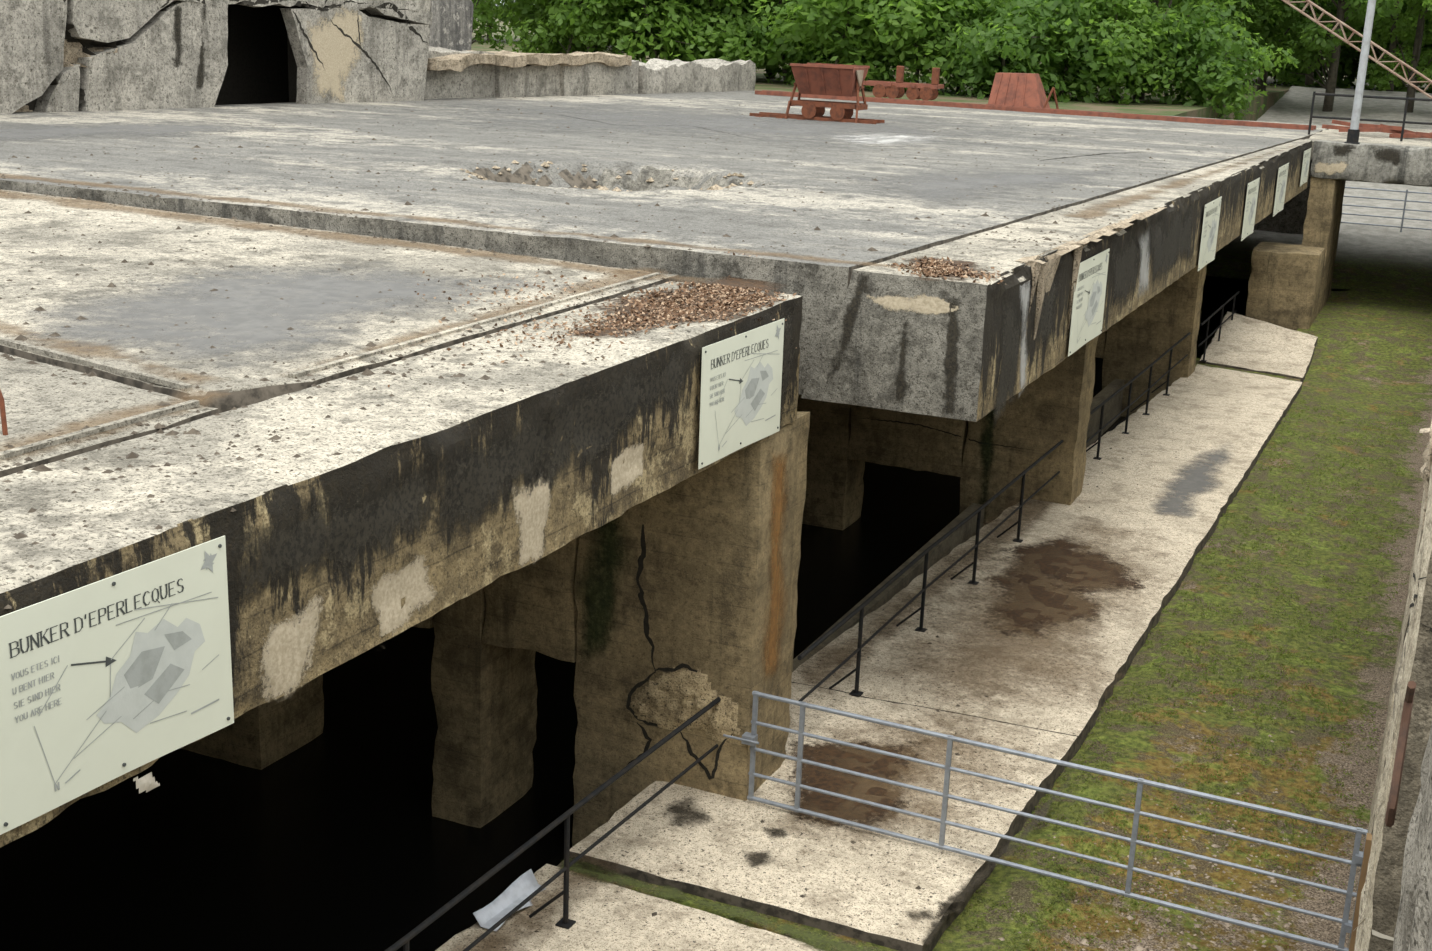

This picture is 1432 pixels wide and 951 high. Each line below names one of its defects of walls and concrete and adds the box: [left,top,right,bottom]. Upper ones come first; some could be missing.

crack [26,0,130,107]
crack [159,0,427,92]
water stain [895,323,908,401]
water stain [943,299,960,413]
water stain [1021,285,1029,388]
spalling [1419,421,1432,548]
crack [626,524,733,780]
spalling [630,667,741,743]
water stain [814,409,1145,693]
crack [1407,573,1432,633]
water stain [845,720,982,827]